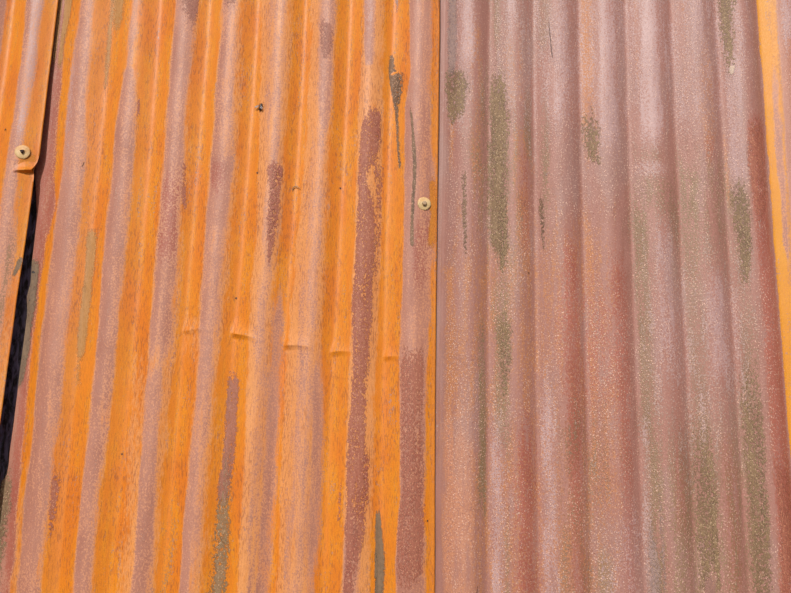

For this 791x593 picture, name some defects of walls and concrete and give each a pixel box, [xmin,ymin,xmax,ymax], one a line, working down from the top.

corrosion [104,0,123,89]
corrosion [256,160,283,262]
corrosion [428,177,436,247]
corrosion [747,112,768,221]
corrosion [337,106,384,593]
corrosion [48,475,62,536]
corrosion [216,371,240,503]
corrosion [396,347,428,593]
corrosion [775,454,791,593]